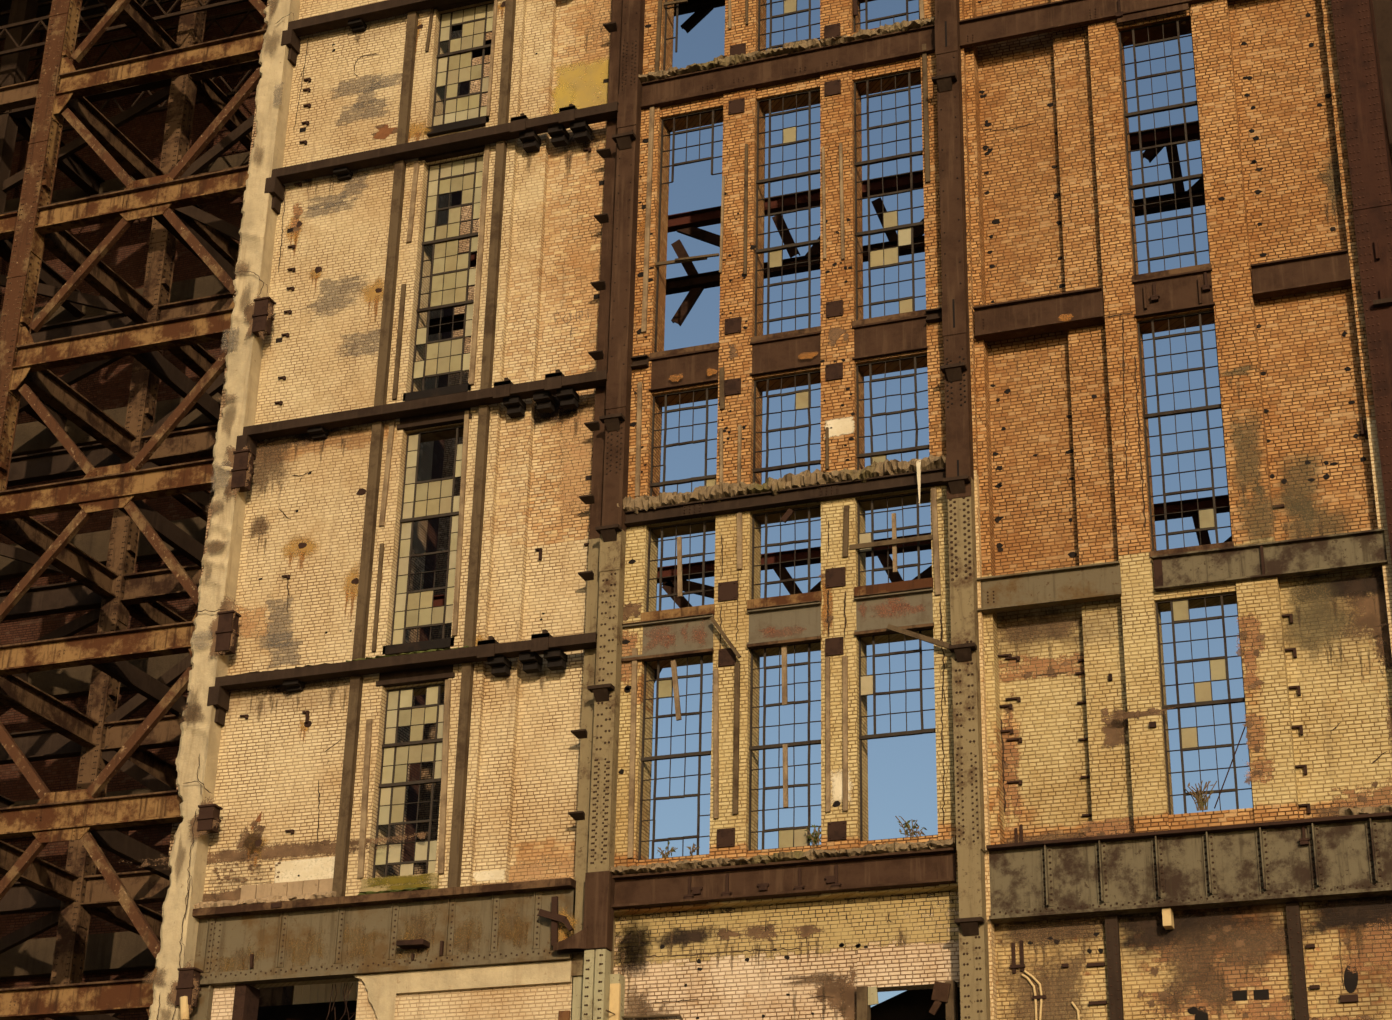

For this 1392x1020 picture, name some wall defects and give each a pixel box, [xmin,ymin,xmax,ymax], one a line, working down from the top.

damp [1233,421,1344,543]
corrosion [284,538,315,569]
corrosion [344,567,360,617]
spalling [999,652,1085,833]
spalling [202,811,429,902]
corrosion [558,912,575,942]
damp [718,924,824,941]
spalling [167,962,199,1014]
damp [624,994,671,1020]
damp [784,956,857,1020]
damp [1000,918,1103,1020]
damp [1161,923,1308,1008]